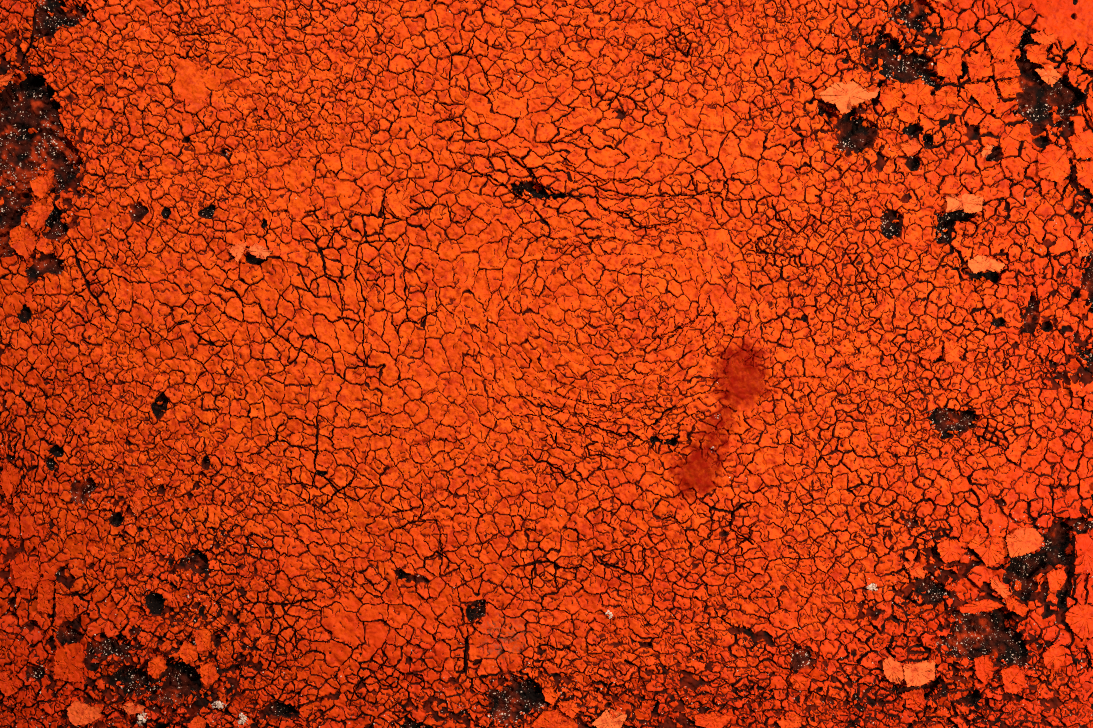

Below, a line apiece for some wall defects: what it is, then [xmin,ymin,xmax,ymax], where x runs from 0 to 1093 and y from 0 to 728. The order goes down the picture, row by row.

spalling [34,0,89,39]
spalling [817,0,1093,189]
spalling [0,71,83,283]
spalling [880,209,904,240]
spalling [933,193,983,244]
spalling [962,255,1007,284]
crack [0,0,548,728]
crack [391,0,1093,728]
spalling [922,408,981,440]
spalling [0,561,221,715]
spalling [488,675,581,728]
spalling [880,518,1093,711]